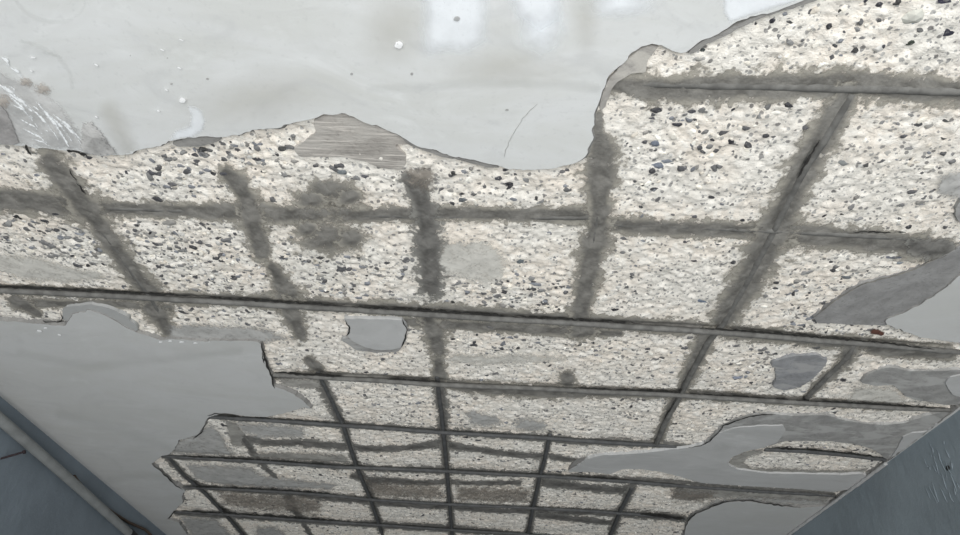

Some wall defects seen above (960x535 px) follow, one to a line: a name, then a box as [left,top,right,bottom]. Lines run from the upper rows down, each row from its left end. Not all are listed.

spalling [645,0,960,83]
spalling [0,69,831,324]
water stain [0,57,960,412]
spalling [793,95,960,246]
spalling [0,209,960,535]
water stain [162,316,836,535]